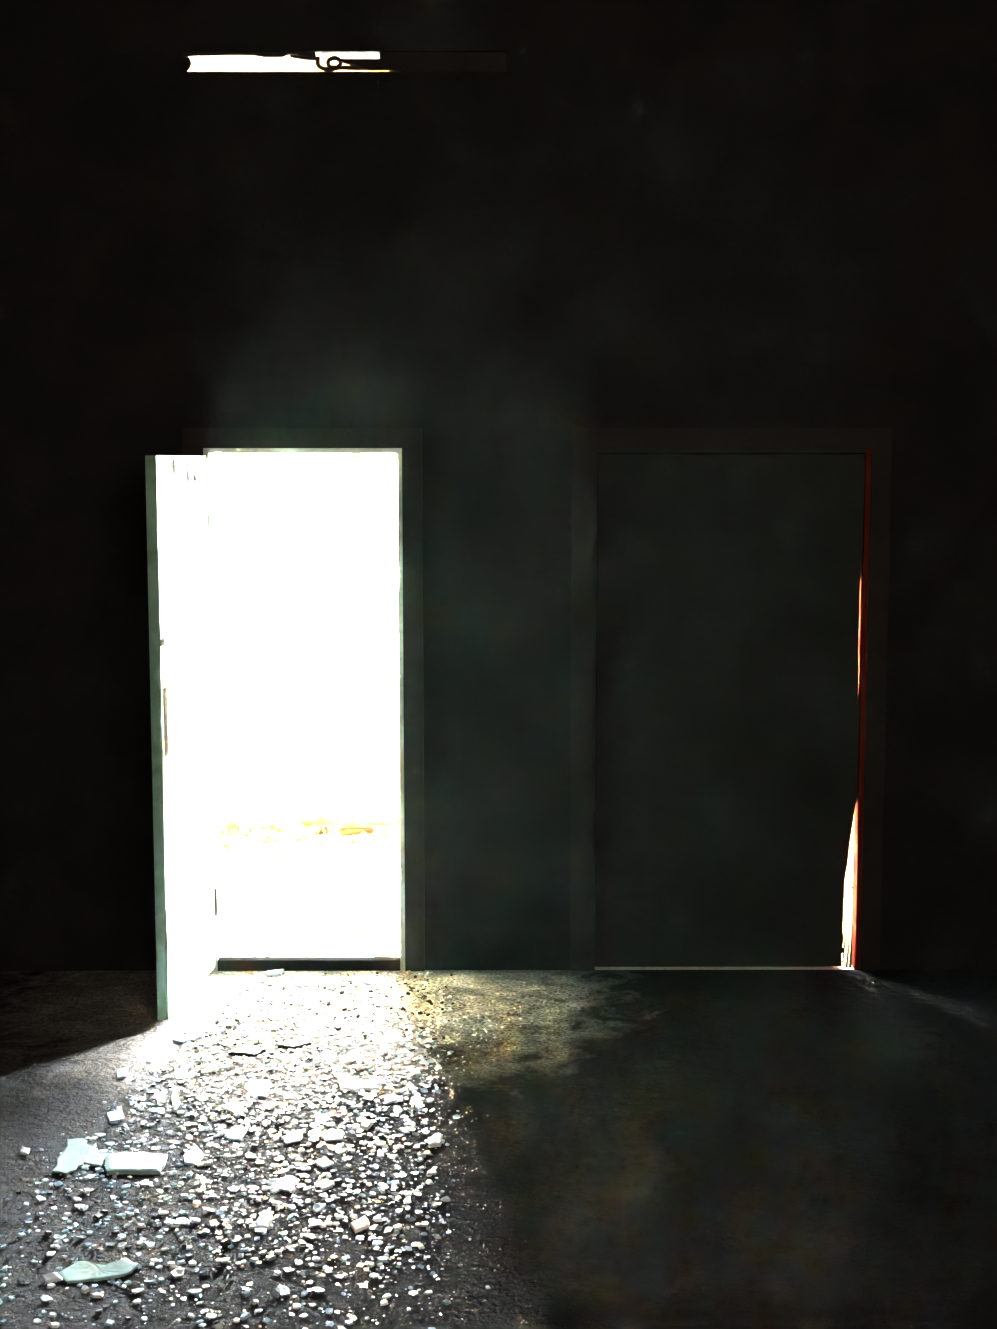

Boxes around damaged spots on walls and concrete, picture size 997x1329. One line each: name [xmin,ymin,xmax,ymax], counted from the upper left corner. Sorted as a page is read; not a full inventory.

flaking render [212,453,303,557]
flaking render [301,675,400,826]